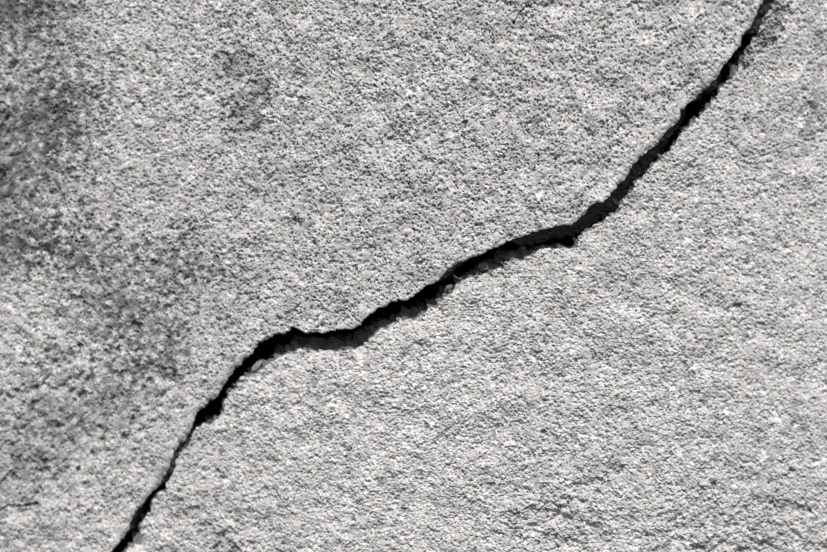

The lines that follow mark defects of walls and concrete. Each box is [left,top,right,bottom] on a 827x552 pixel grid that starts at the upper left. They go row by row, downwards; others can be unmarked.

crack [255,0,774,368]
crack [111,241,527,552]